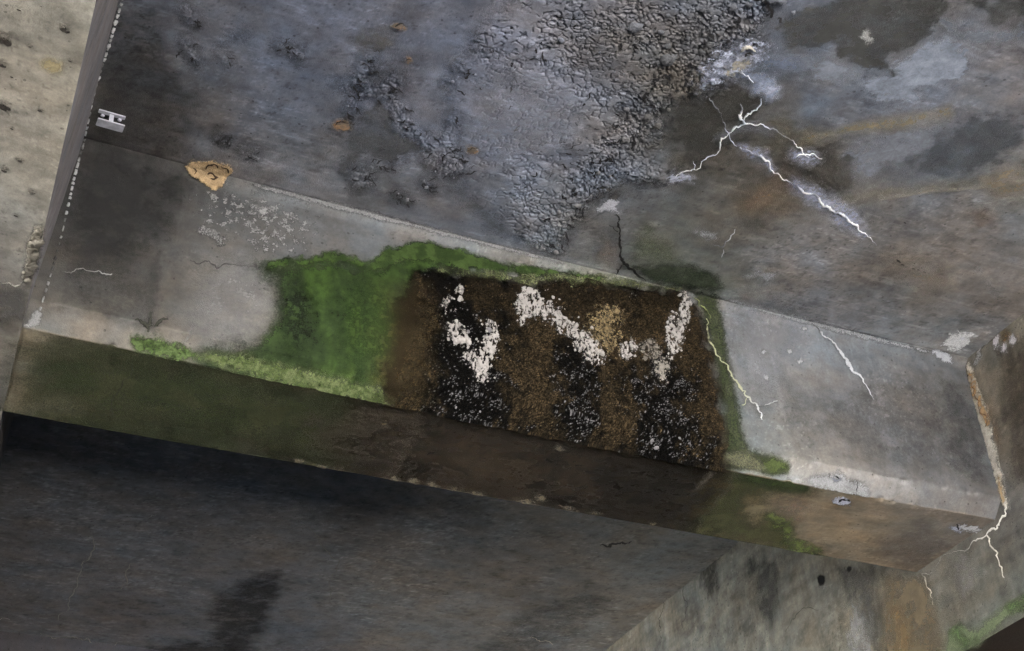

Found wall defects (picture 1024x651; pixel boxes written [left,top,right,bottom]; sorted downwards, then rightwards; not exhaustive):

rust [185,161,233,191]
spalling [330,0,795,257]
crack [670,98,876,244]
crack [609,214,646,281]
leakage [135,306,168,332]
leakage [288,266,739,533]
crack [694,297,776,419]
crack [812,323,874,399]
crack [921,362,1008,604]